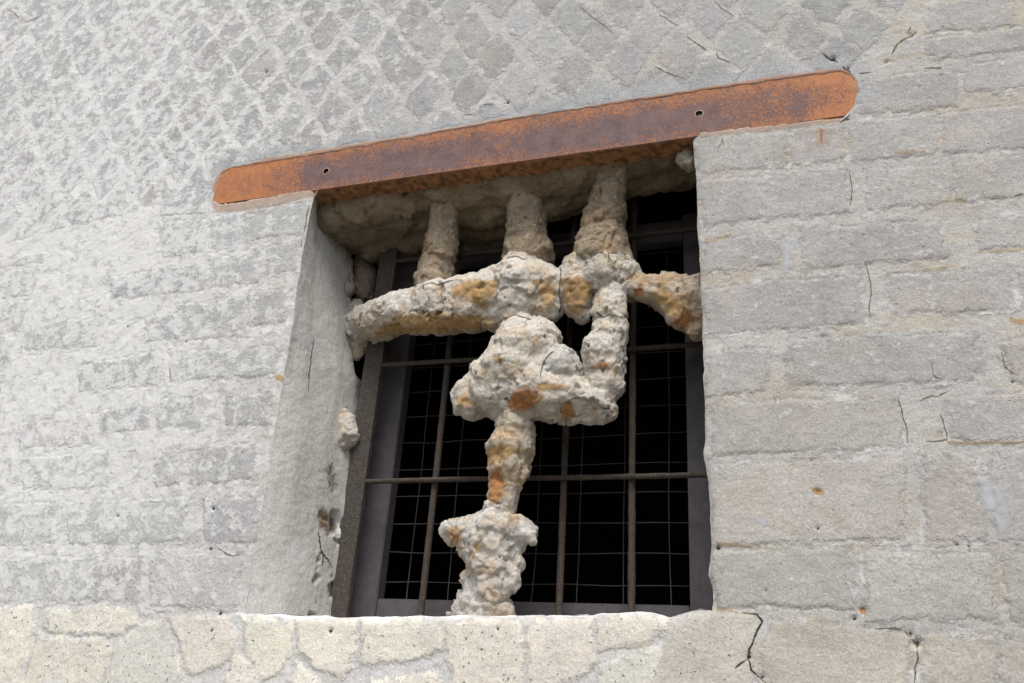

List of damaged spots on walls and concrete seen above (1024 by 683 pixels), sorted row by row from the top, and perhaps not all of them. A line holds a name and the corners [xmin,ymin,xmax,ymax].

corrosion [553,69,860,113]
corrosion [212,113,540,213]
crack [864,260,872,317]
crack [898,364,1024,443]
spalling [318,506,337,533]
crack [735,612,766,683]
crack [876,627,919,683]